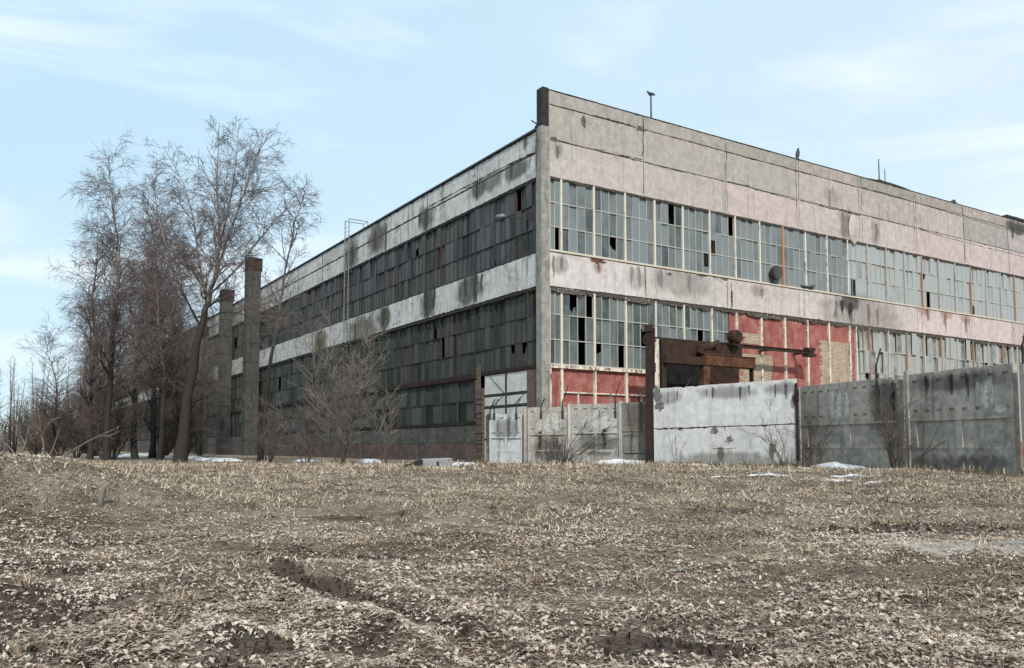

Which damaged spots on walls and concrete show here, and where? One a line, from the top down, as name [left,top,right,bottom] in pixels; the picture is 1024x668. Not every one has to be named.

leakage [473,161,526,199]
leakage [345,223,387,271]
leakage [423,284,435,319]
leakage [460,272,483,305]